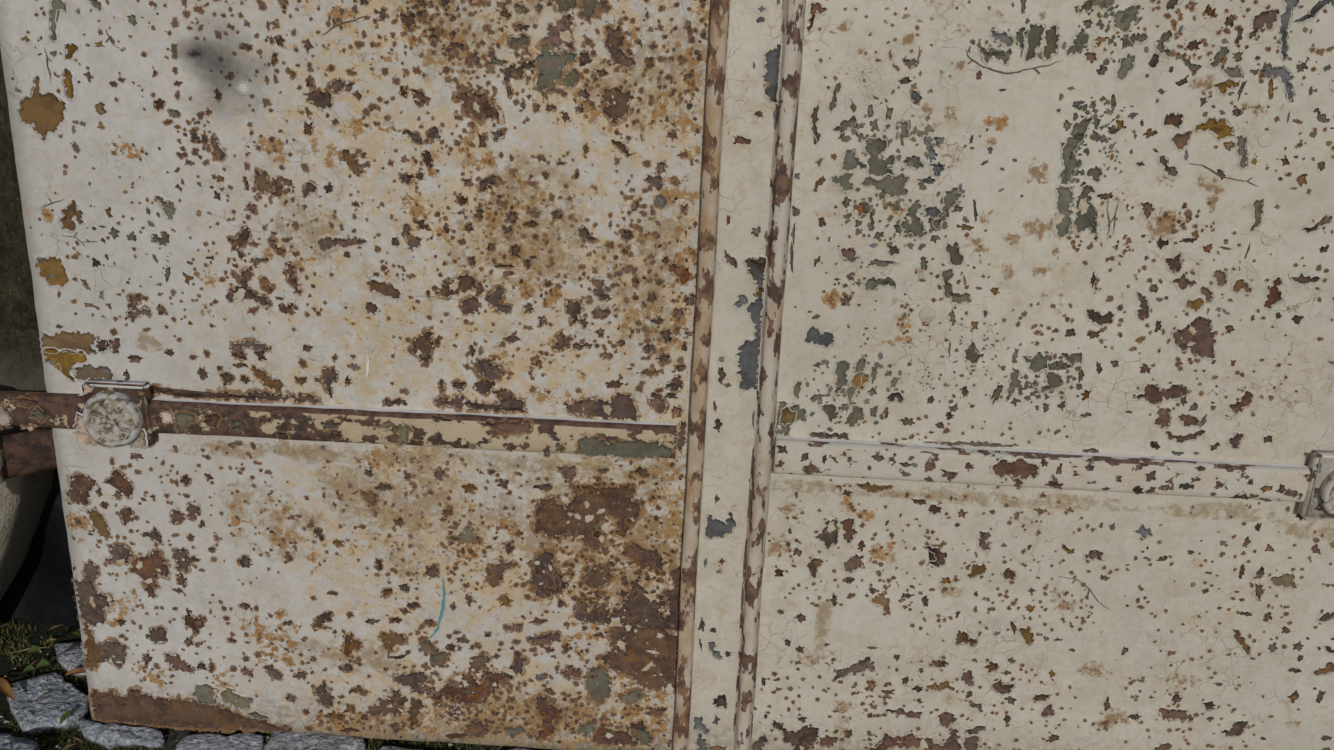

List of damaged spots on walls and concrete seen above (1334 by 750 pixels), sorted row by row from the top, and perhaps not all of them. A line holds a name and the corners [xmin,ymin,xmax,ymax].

corrosion [310,117,401,168]
corrosion [602,1,710,265]
peeling [718,226,767,392]
peeling [11,0,711,748]
peeling [750,0,1334,750]
corrosion [225,490,321,575]
peeling [703,494,738,541]
corrosion [240,607,315,668]
corrosion [302,456,687,750]
peeling [698,618,731,661]
corrosion [88,660,293,734]
peeling [691,693,730,750]